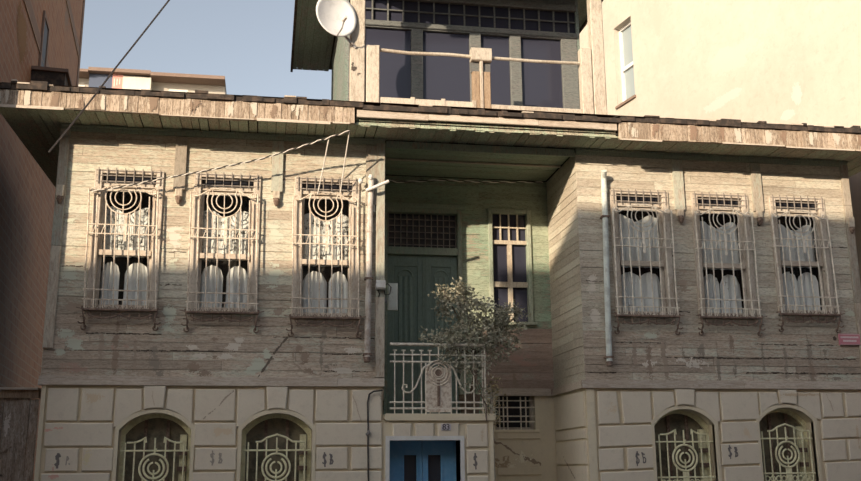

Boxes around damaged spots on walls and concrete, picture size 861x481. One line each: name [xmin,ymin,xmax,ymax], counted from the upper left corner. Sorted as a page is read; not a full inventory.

peeling [166,226,184,277]
peeling [268,220,285,241]